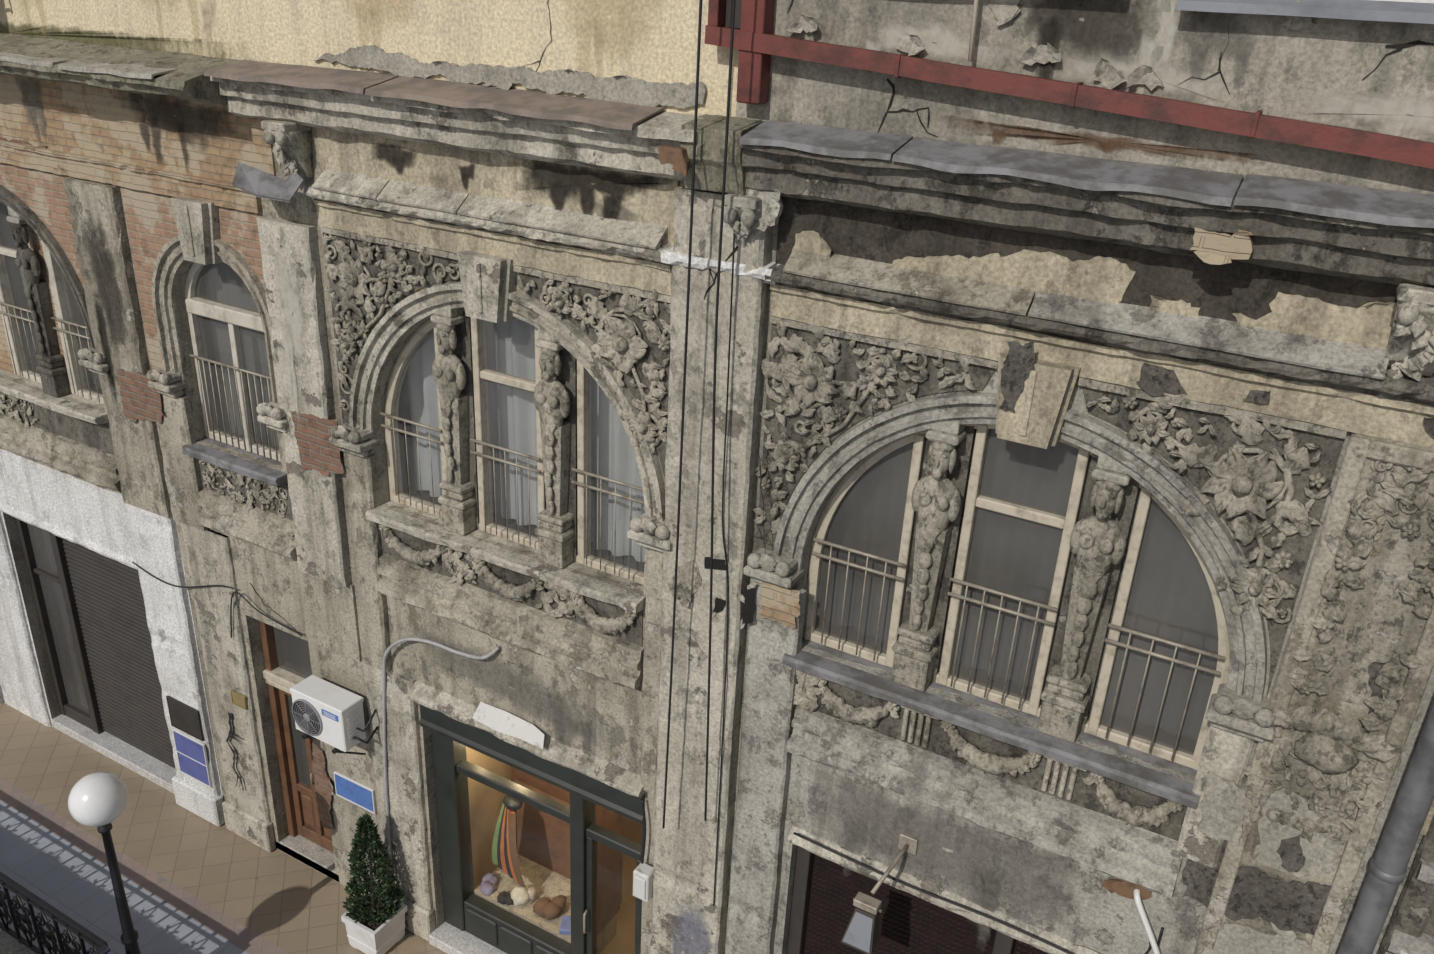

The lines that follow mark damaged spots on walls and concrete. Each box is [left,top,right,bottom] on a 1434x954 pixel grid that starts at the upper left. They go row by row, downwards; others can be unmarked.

crack [527,1,552,72]
crack [1178,30,1230,95]
crack [1362,40,1434,80]
water stain [129,92,222,165]
crack [878,79,938,137]
water stain [526,160,666,219]
flaking render [1190,227,1254,265]
peeling [892,249,1136,305]
peeling [1147,295,1200,317]
peeling [1232,291,1396,349]